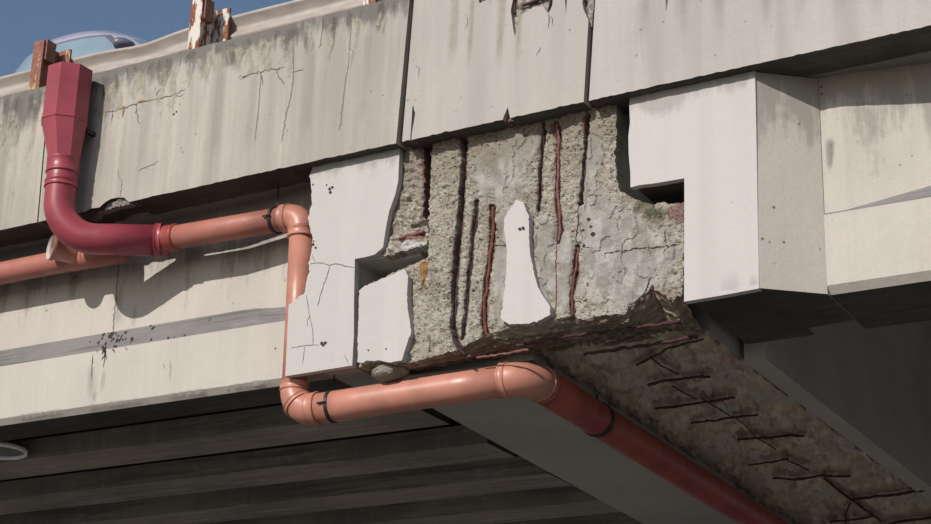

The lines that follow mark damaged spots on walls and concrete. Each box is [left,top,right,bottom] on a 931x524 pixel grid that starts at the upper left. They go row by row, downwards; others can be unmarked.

spalling [513,0,553,31]
spalling [584,0,595,28]
crack [91,89,185,124]
crack [239,30,300,142]
crack [293,255,354,363]
spalling [357,105,931,524]